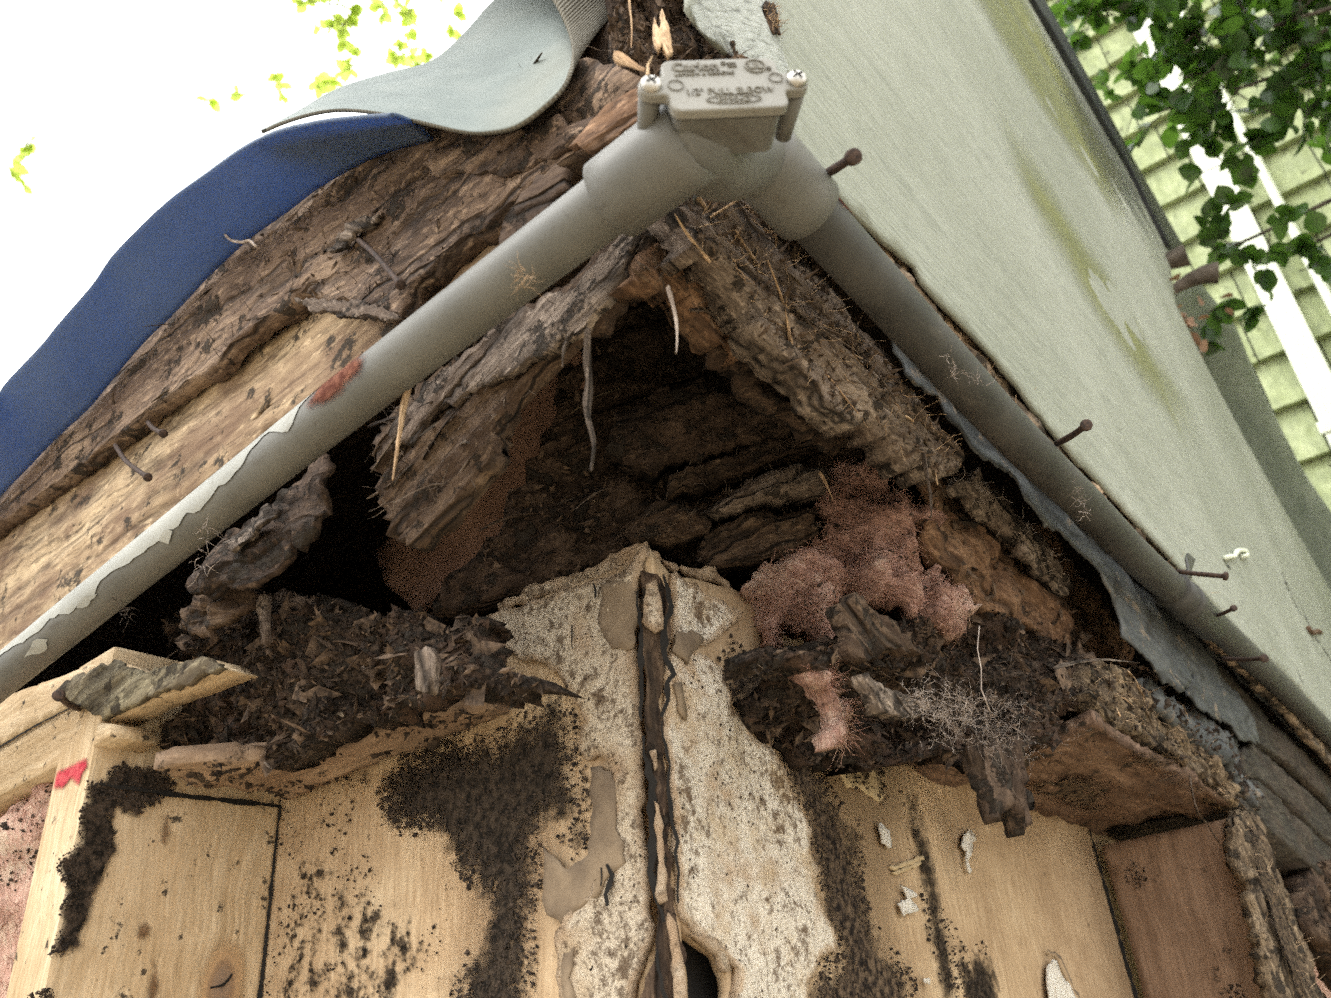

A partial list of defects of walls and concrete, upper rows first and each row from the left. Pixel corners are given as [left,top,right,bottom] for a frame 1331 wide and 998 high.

leakage [47,760,177,958]
peeling [159,592,507,777]
leakage [263,604,618,998]
crack [600,864,614,906]
crack [636,570,687,998]
leakage [683,600,761,713]
peeling [754,691,820,756]
leakage [679,723,998,998]
peeling [878,823,892,848]
peeling [837,611,1097,802]